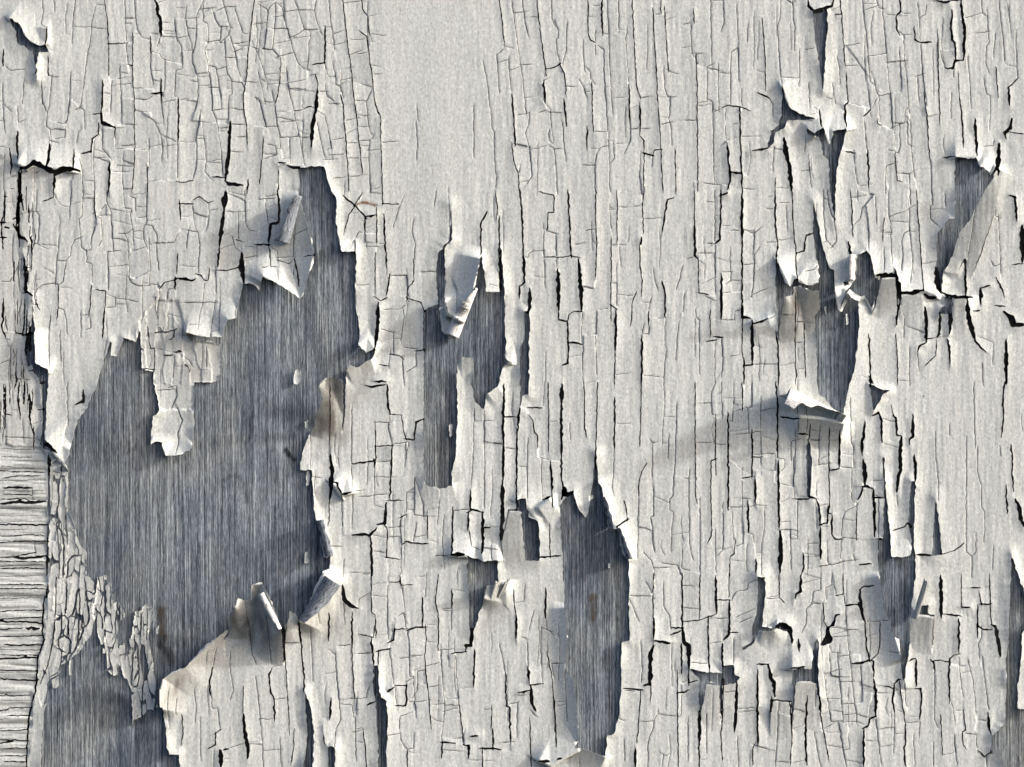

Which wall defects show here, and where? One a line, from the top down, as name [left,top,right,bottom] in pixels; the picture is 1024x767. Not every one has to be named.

peeling [6,120,379,767]
crack [0,0,574,767]
peeling [387,212,530,516]
peeling [553,442,655,756]
crack [480,0,1024,767]
peeling [741,0,889,506]
peeling [909,75,1001,338]